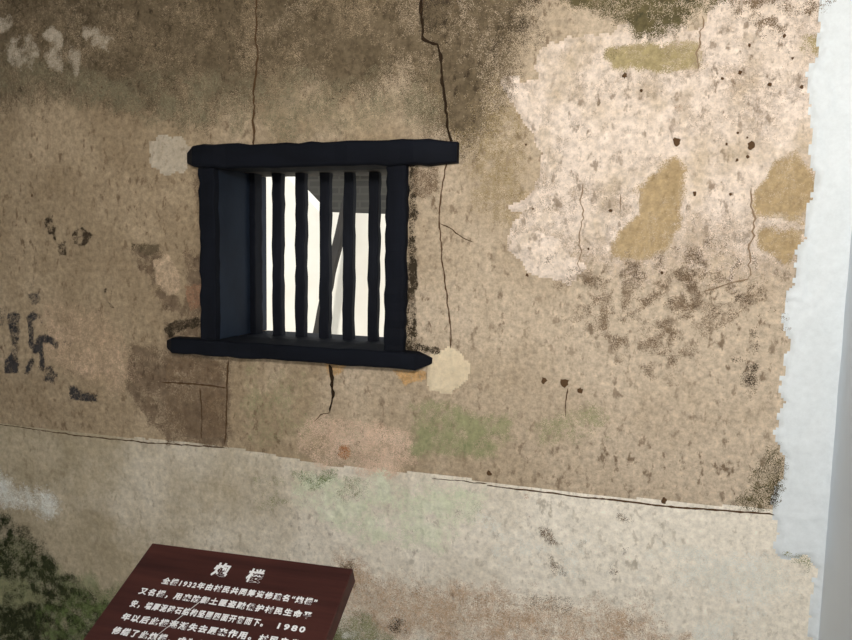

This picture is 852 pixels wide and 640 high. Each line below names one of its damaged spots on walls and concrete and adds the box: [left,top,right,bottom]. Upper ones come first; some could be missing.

peeling [0,15,81,77]
peeling [78,25,112,54]
crack [251,0,259,144]
damp [0,0,730,230]
crack [419,0,453,141]
peeling [501,0,821,307]
crack [438,165,472,348]
crack [315,363,346,421]
damp [0,468,63,520]
damp [252,467,812,640]